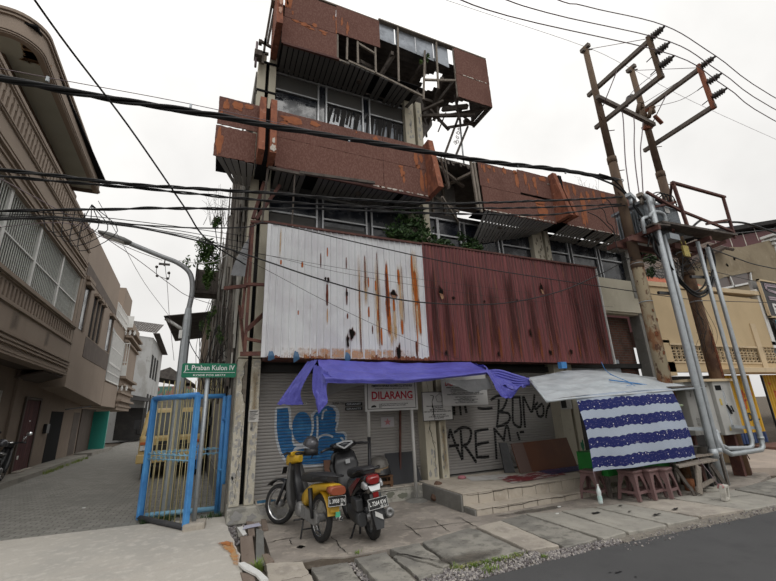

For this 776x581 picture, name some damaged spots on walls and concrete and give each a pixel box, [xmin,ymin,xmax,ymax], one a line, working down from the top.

corrosion [267,252,456,361]